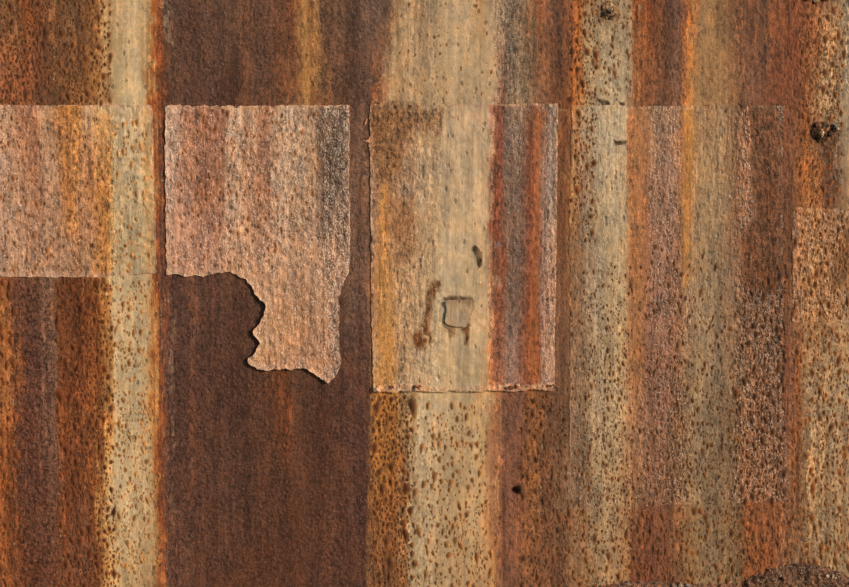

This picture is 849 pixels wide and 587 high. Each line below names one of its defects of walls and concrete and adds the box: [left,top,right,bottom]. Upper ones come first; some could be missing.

corrosion [0,0,478,587]
corrosion [443,0,715,587]
corrosion [698,0,849,587]